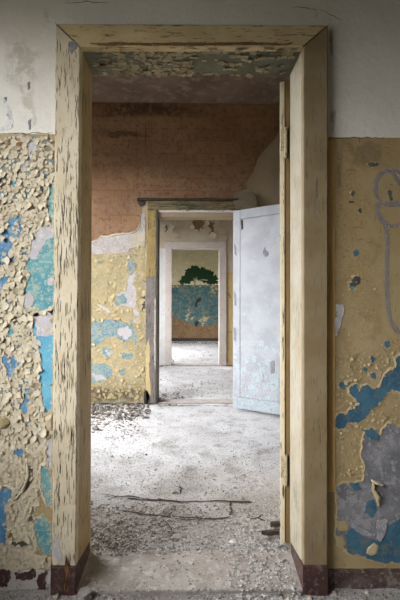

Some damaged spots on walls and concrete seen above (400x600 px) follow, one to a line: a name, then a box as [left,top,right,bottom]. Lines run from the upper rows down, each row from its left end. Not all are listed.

peeling [91,41,297,79]
spalling [91,102,280,242]
peeling [0,97,78,590]
peeling [91,244,146,401]
peeling [333,268,376,337]
crack [94,485,252,533]
peeling [333,336,400,567]